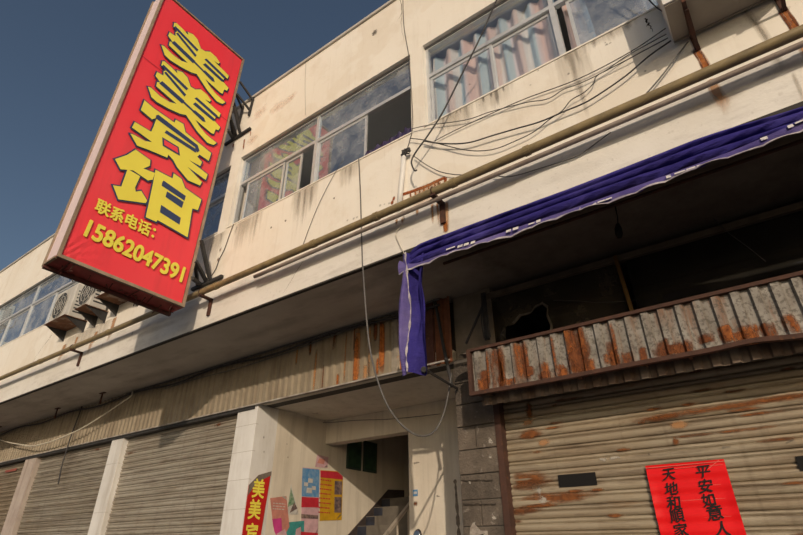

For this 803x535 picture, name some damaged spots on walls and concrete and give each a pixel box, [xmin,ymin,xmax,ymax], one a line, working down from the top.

corrosion [779,10,799,30]
corrosion [693,50,709,68]
corrosion [391,177,447,205]
corrosion [431,202,448,232]
corrosion [333,322,385,384]
corrosion [478,328,595,390]
corrosion [604,326,648,366]
corrosion [657,314,801,356]
corrosion [521,403,560,453]
corrosion [638,394,803,444]
corrosion [513,473,603,522]